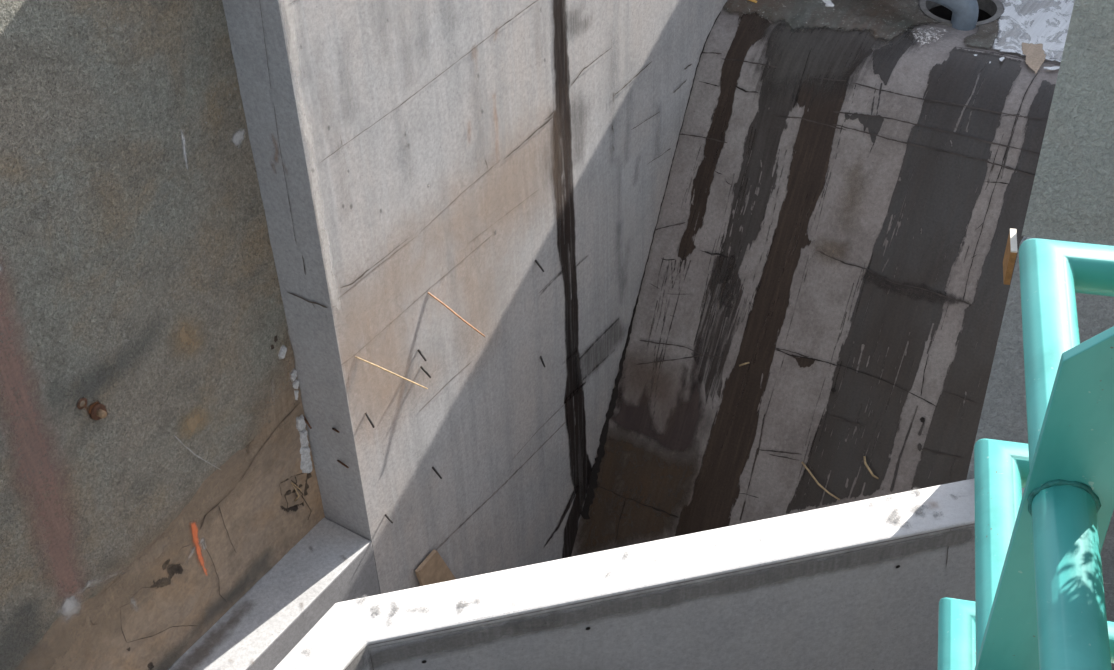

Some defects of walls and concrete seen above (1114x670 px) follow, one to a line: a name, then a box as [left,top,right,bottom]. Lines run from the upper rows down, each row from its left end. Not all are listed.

leakage [543,0,621,559]
leakage [610,0,1075,536]